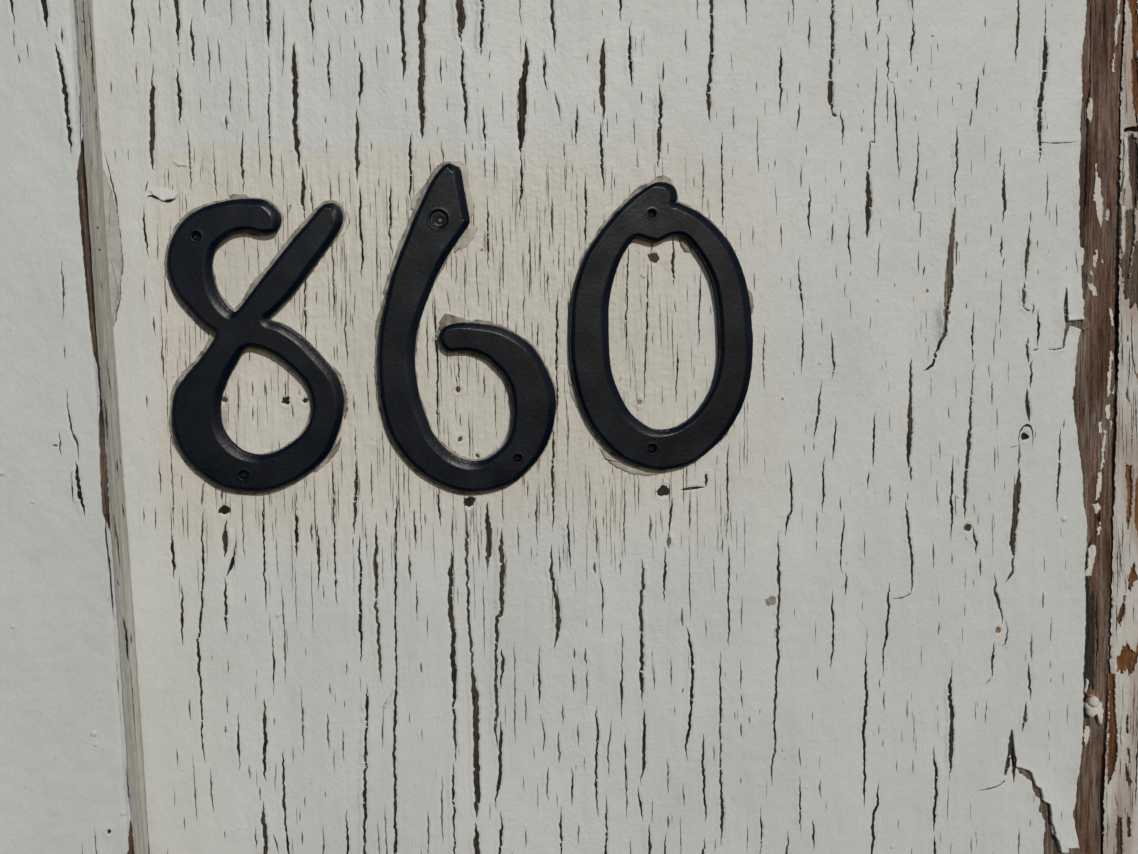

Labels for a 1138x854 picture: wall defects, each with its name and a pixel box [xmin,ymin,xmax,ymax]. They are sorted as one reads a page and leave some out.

peeling [1093,0,1138,310]
peeling [1086,250,1104,296]
peeling [1063,313,1090,348]
crack [10,0,865,854]
crack [756,0,1138,854]
peeling [1085,351,1118,578]
peeling [1125,465,1138,535]
peeling [1117,563,1138,623]
peeling [1106,644,1138,784]
peeling [1016,767,1080,854]
peeling [1116,817,1130,854]